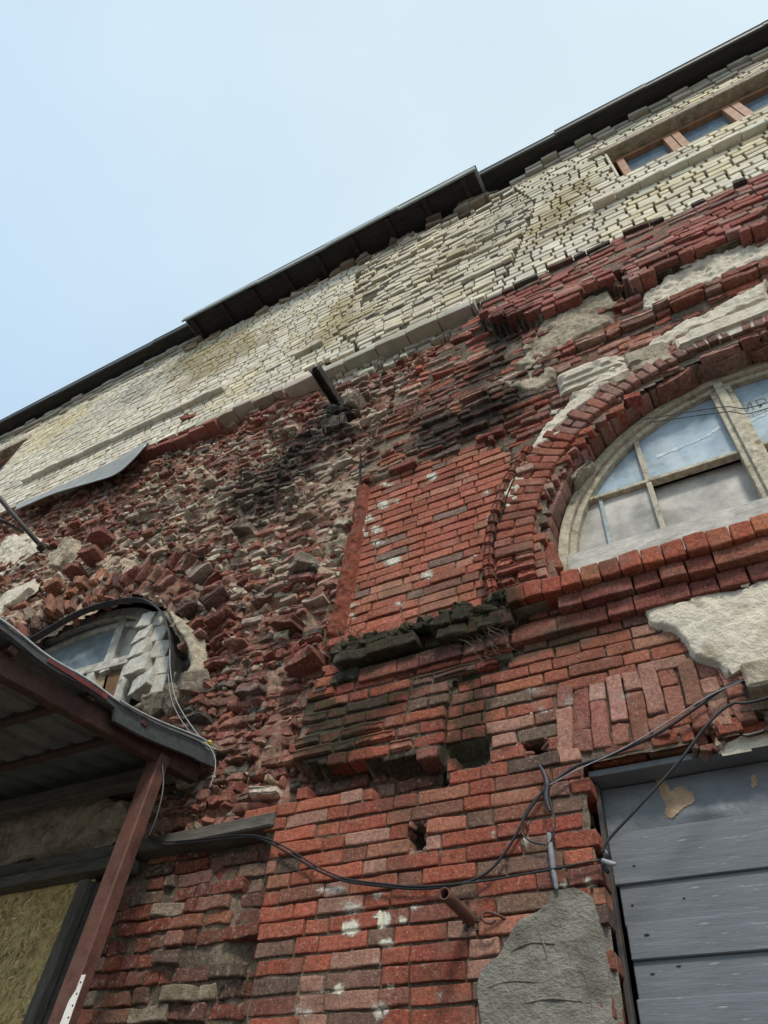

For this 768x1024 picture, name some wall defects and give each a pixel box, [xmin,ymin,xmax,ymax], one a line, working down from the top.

flaking render [498,271,627,392]
flaking render [643,238,768,317]
flaking render [649,279,768,346]
flaking render [532,363,629,449]
damp [234,429,330,530]
damp [362,477,399,546]
flaking render [504,473,524,508]
spalling [0,328,462,839]
flaking render [645,580,768,680]
damp [316,886,364,951]
damp [374,893,420,948]
damp [372,1000,390,1021]